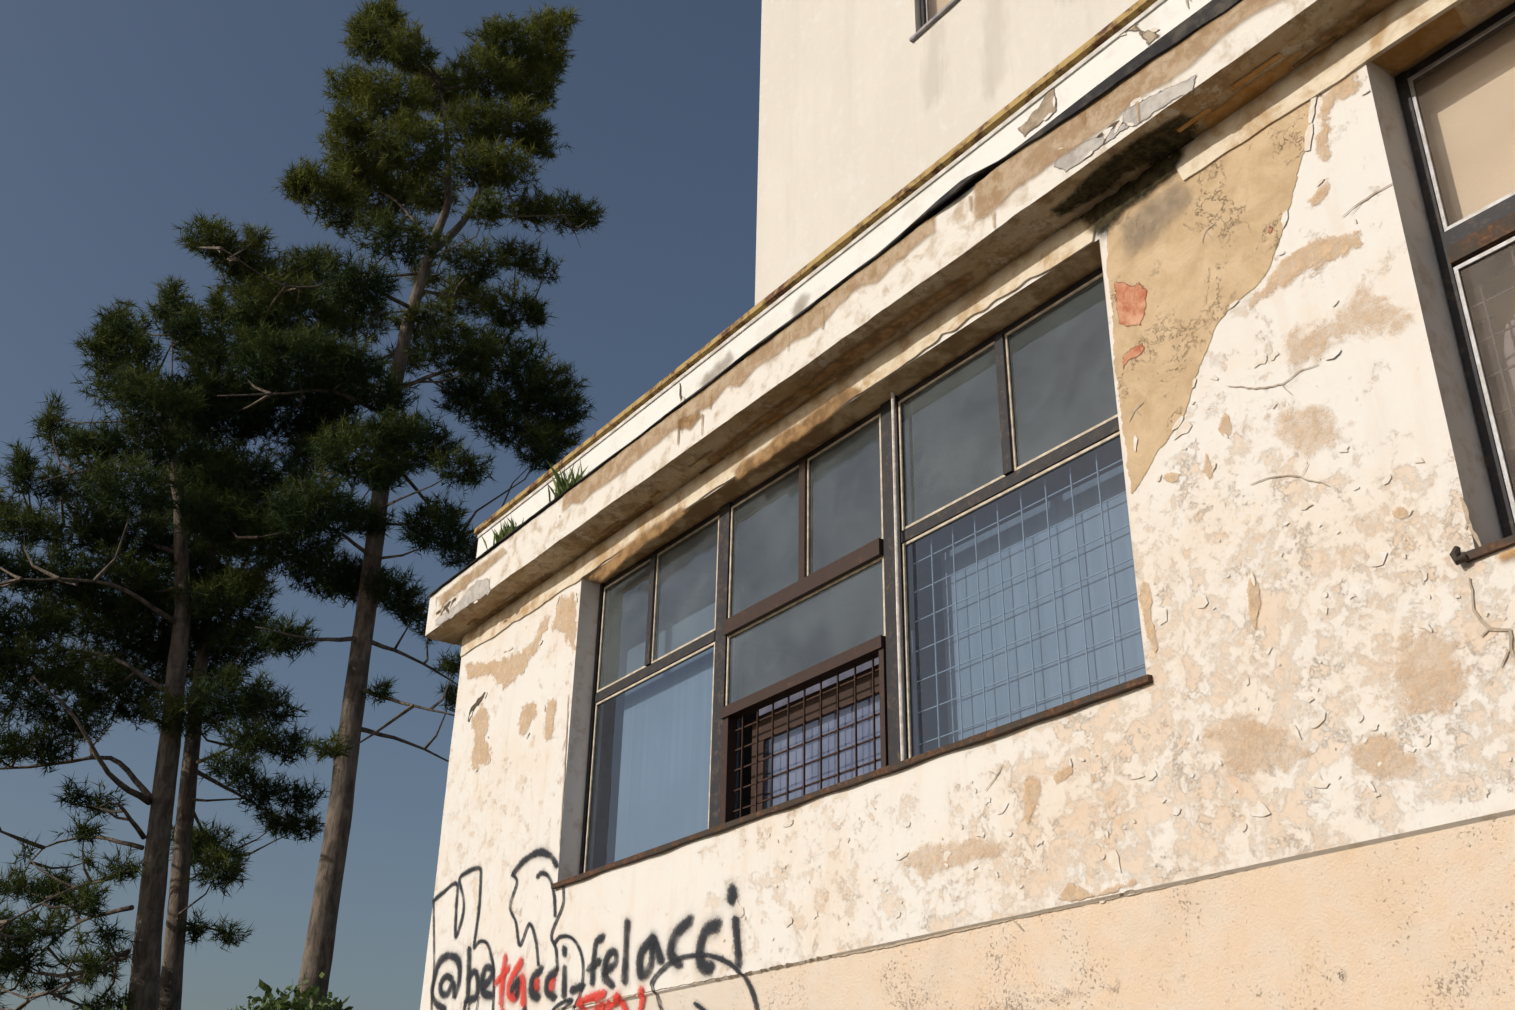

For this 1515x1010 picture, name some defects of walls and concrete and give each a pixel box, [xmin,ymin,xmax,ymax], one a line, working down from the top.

spalling [1120,23,1159,45]
peeling [1372,8,1466,71]
spalling [1054,75,1196,172]
leakage [1052,0,1398,234]
spalling [1106,70,1370,493]
spalling [435,578,490,625]
peeling [1247,573,1261,628]
crack [1460,497,1515,667]
corrosion [1499,548,1515,560]
peeling [465,593,577,690]
peeling [471,703,492,771]
peeling [518,698,556,740]